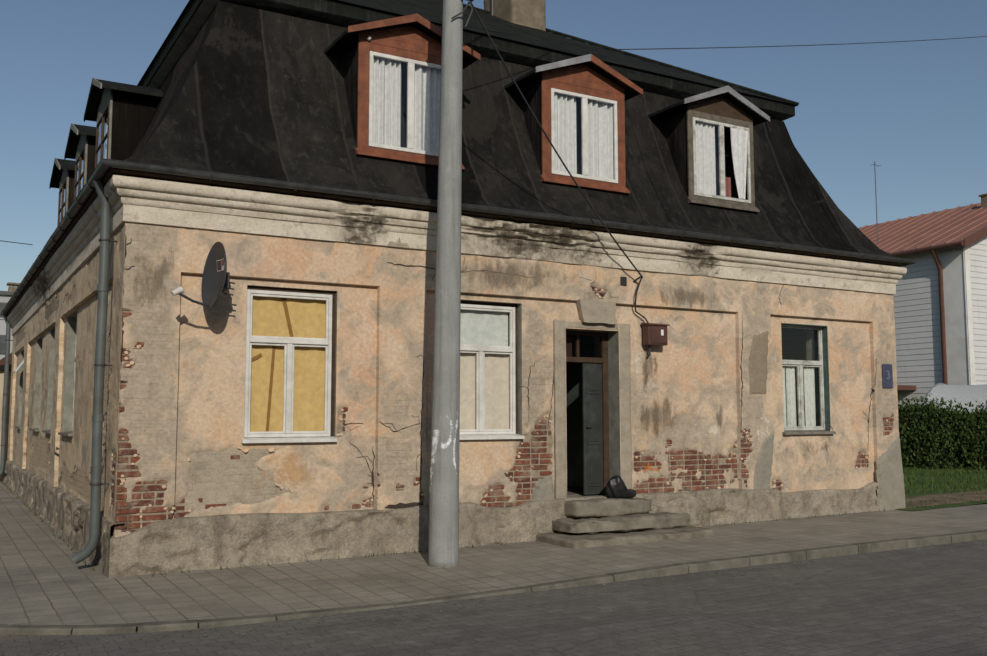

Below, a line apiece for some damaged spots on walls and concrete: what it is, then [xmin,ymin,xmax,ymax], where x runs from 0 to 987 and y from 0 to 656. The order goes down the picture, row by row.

damp [344,216,387,244]
damp [480,219,602,260]
peeling [58,332,294,537]
crack [344,355,430,502]
flaking render [882,413,894,436]
flaking render [480,411,553,507]
flaking render [633,428,753,493]
flaking render [855,450,869,469]
flaking render [349,469,424,509]